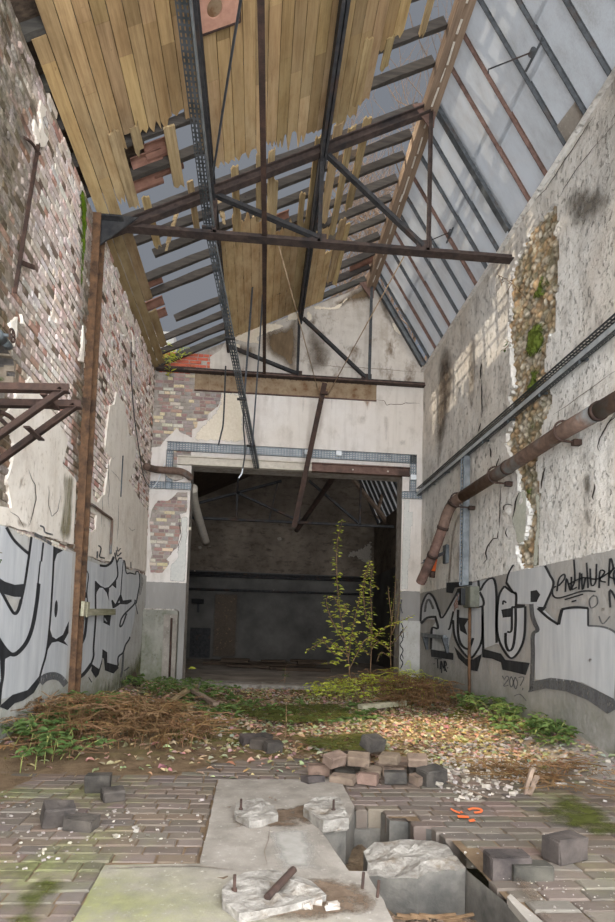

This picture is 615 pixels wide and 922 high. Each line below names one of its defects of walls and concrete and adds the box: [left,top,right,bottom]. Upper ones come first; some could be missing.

spalling [0,314,26,377]
peeling [0,377,76,550]
peeling [88,392,191,581]
spalling [152,352,246,446]
spalling [513,457,541,568]
spalling [507,206,560,455]